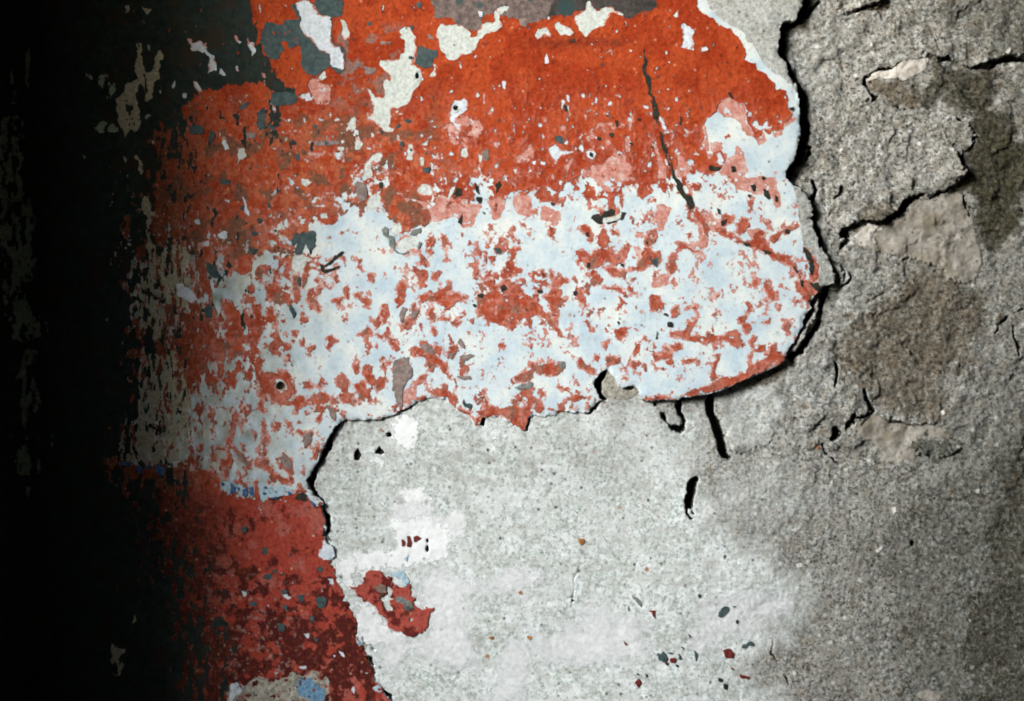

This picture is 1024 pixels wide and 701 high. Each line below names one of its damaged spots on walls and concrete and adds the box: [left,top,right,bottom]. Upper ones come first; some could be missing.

peeling [86,43,201,137]
peeling [238,0,509,150]
peeling [519,1,623,43]
peeling [673,12,708,53]
crack [937,55,1024,71]
crack [777,0,976,363]
peeling [103,101,820,507]
crack [832,361,840,386]
crack [654,394,731,460]
crack [845,389,875,430]
spalling [684,476,699,520]
peeling [343,536,434,637]